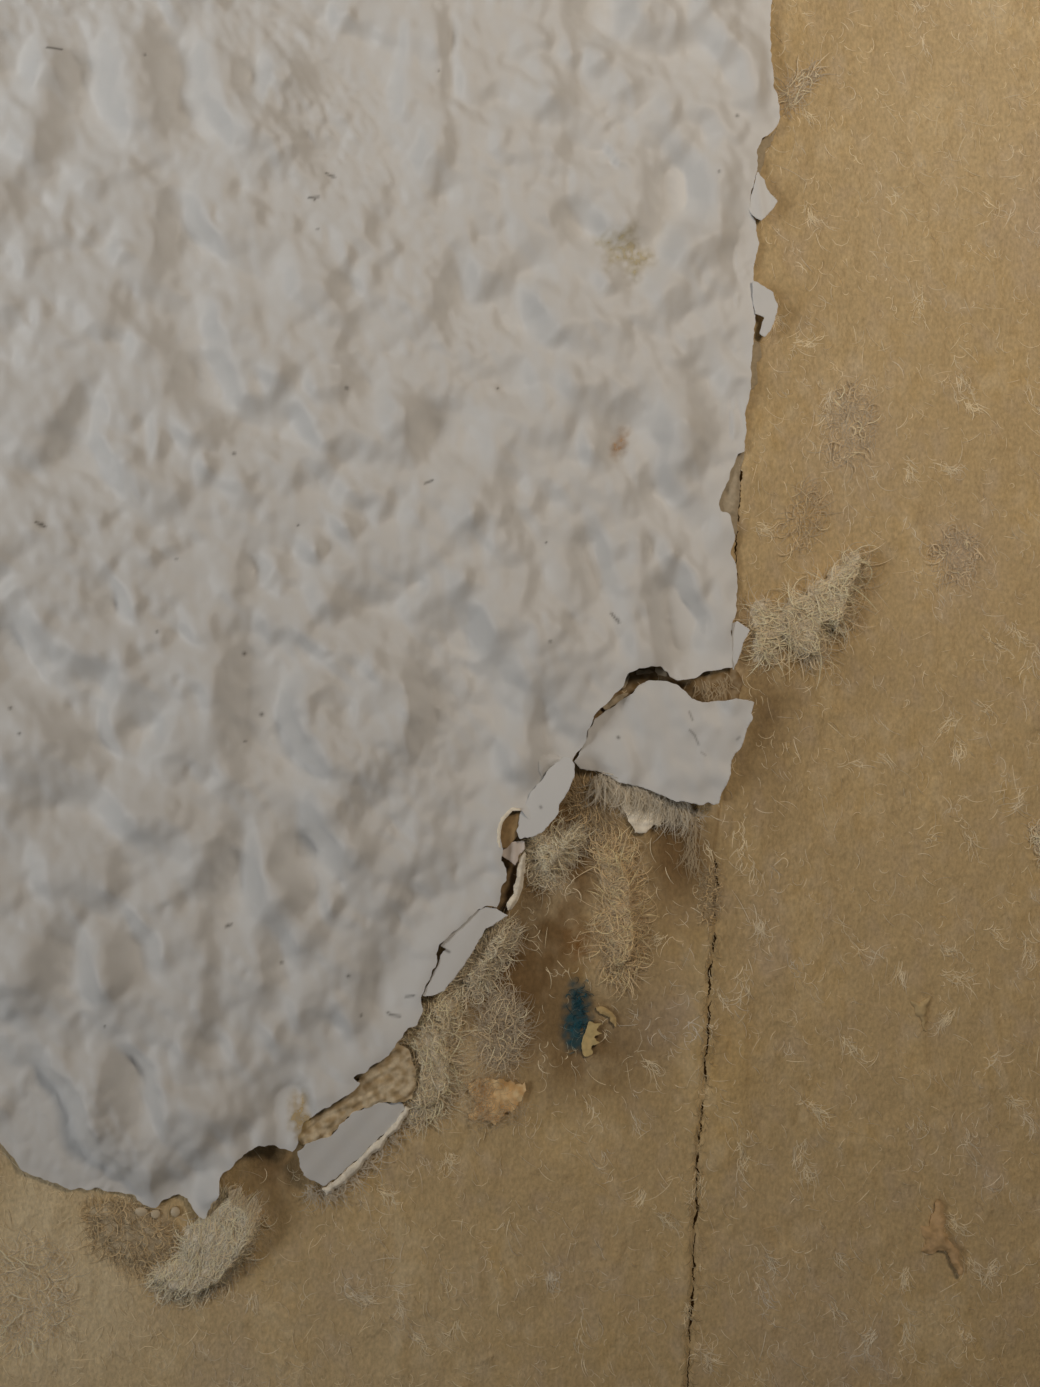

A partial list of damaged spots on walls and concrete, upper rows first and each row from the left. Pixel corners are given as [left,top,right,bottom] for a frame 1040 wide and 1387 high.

peeling [749,172,778,220]
peeling [752,281,778,337]
peeling [731,621,750,670]
peeling [516,667,754,884]
peeling [422,907,508,996]
peeling [581,1006,617,1057]
peeling [292,1043,433,1214]
peeling [450,1041,541,1142]
crack [679,859,726,1387]